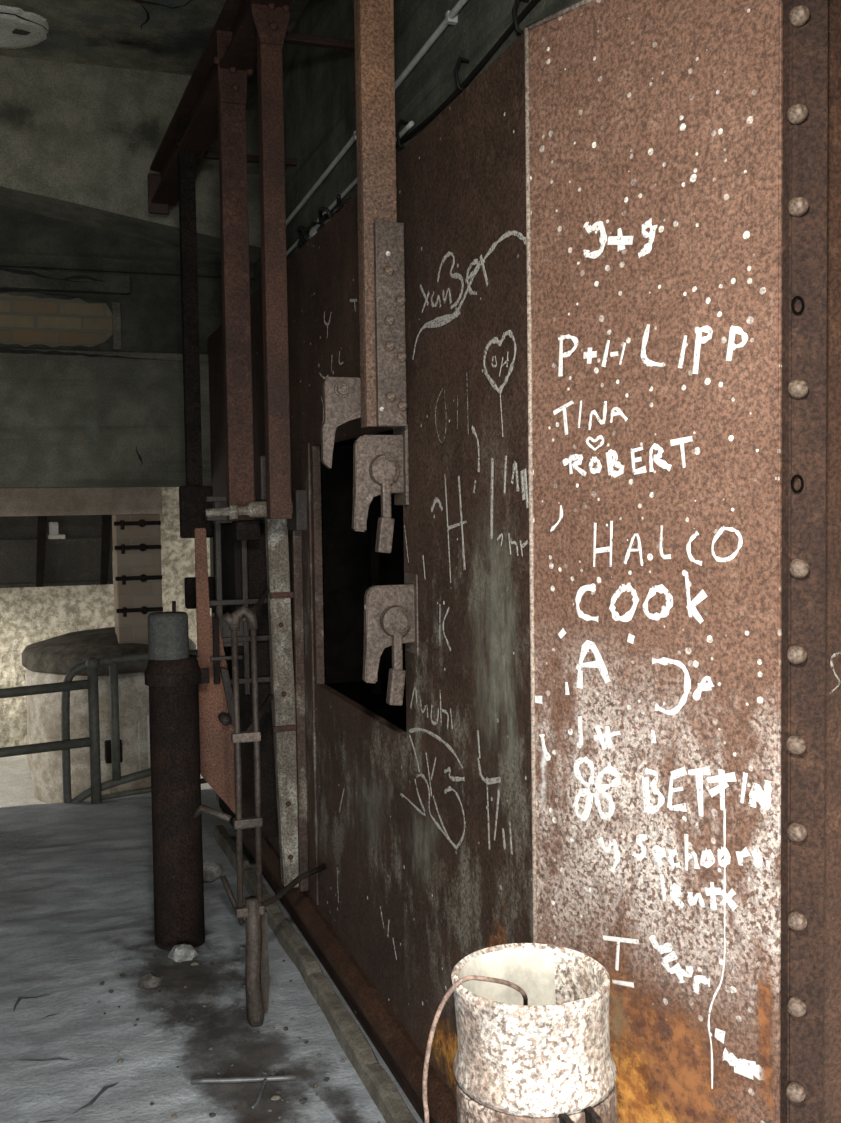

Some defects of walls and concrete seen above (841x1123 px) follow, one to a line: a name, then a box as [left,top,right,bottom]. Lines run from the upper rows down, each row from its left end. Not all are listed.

corrosion [489,925,507,947]
corrosion [433,1027,458,1084]
corrosion [609,974,736,1123]
corrosion [758,977,772,1104]
crack [26,1082,119,1123]